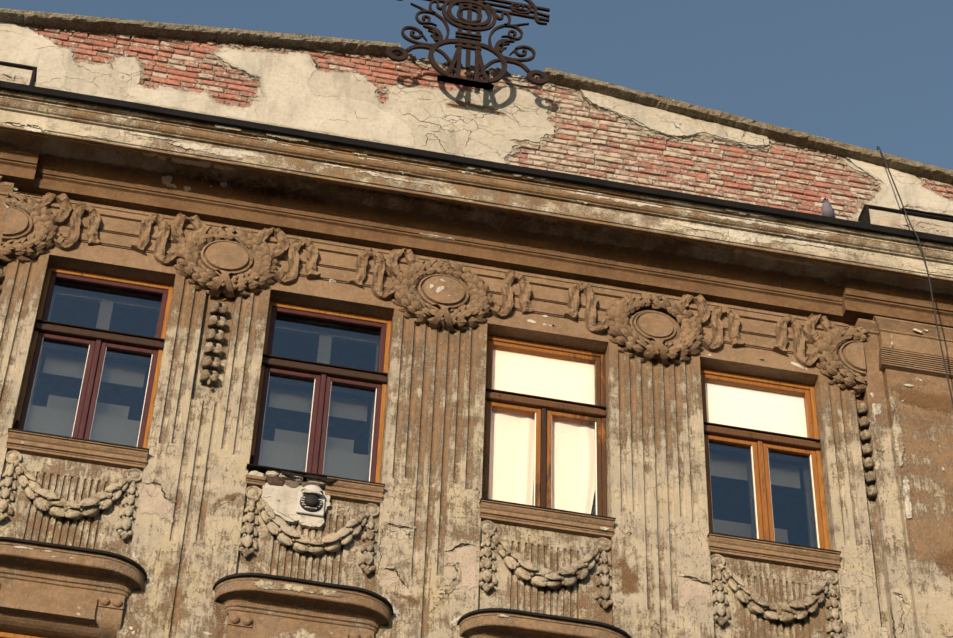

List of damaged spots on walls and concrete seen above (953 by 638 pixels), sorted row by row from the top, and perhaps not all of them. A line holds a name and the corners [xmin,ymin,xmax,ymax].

flaking render [0,72,28,84]
spalling [0,121,48,133]
crack [404,98,448,153]
flaking render [20,25,953,275]
flaking render [868,392,912,518]